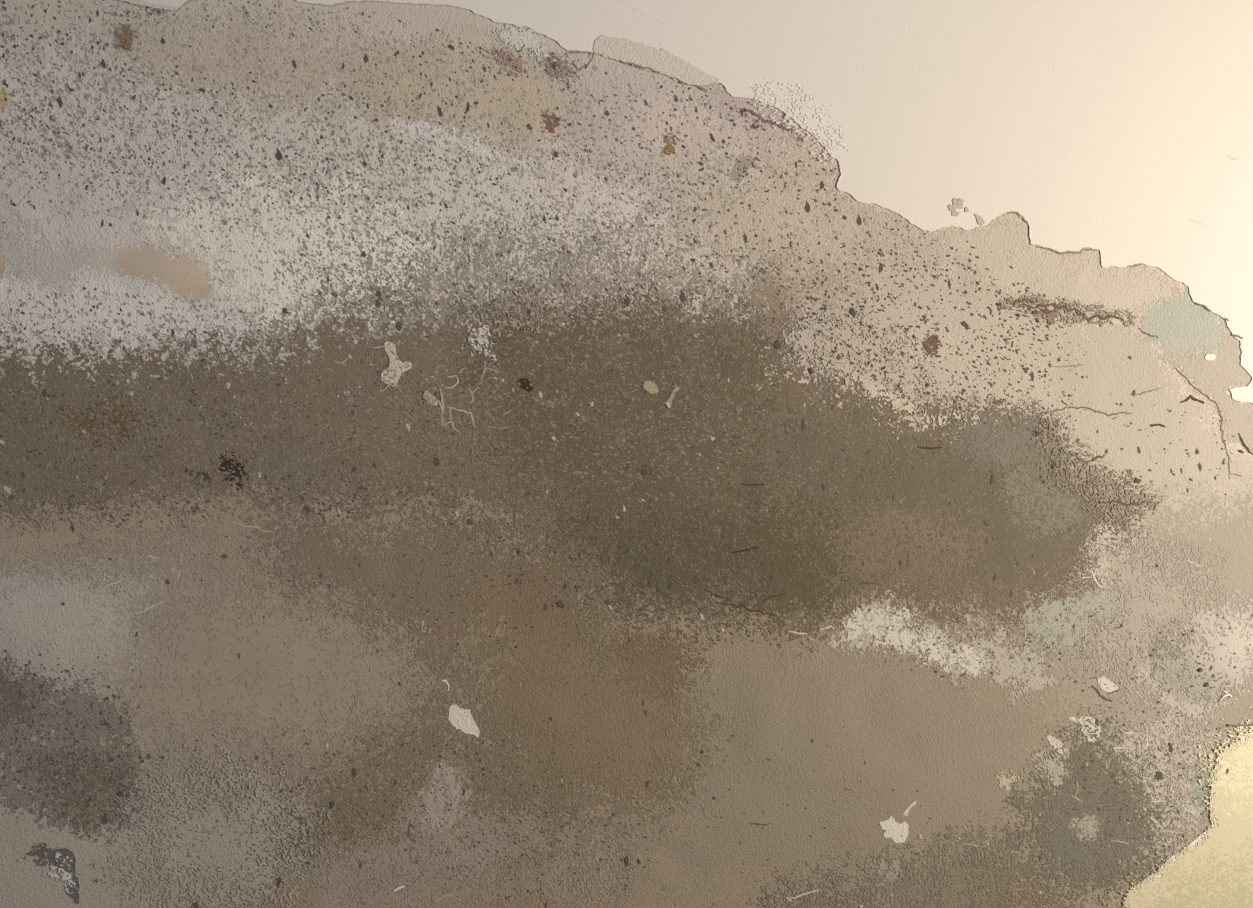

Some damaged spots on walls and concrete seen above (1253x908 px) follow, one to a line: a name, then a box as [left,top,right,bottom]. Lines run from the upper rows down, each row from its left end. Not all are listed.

spalling [0,0,1253,480]
crack [1013,298,1159,339]
crack [1195,302,1243,339]
crack [1052,367,1253,477]